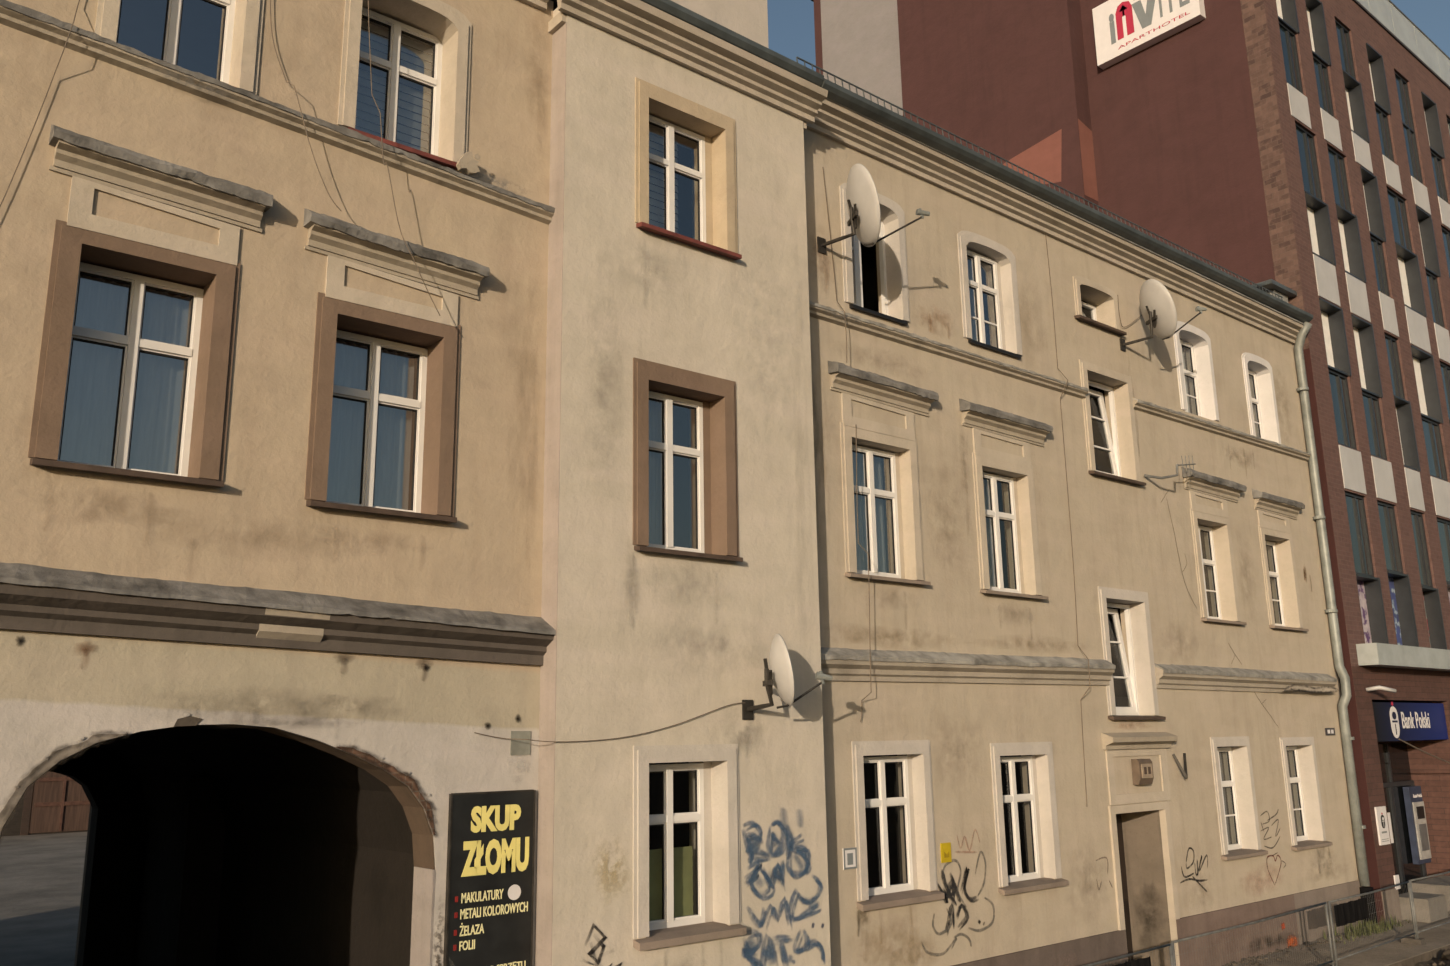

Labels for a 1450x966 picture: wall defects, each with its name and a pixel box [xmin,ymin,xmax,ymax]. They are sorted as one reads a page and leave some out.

spalling [0,732,128,834]
spalling [336,746,436,836]